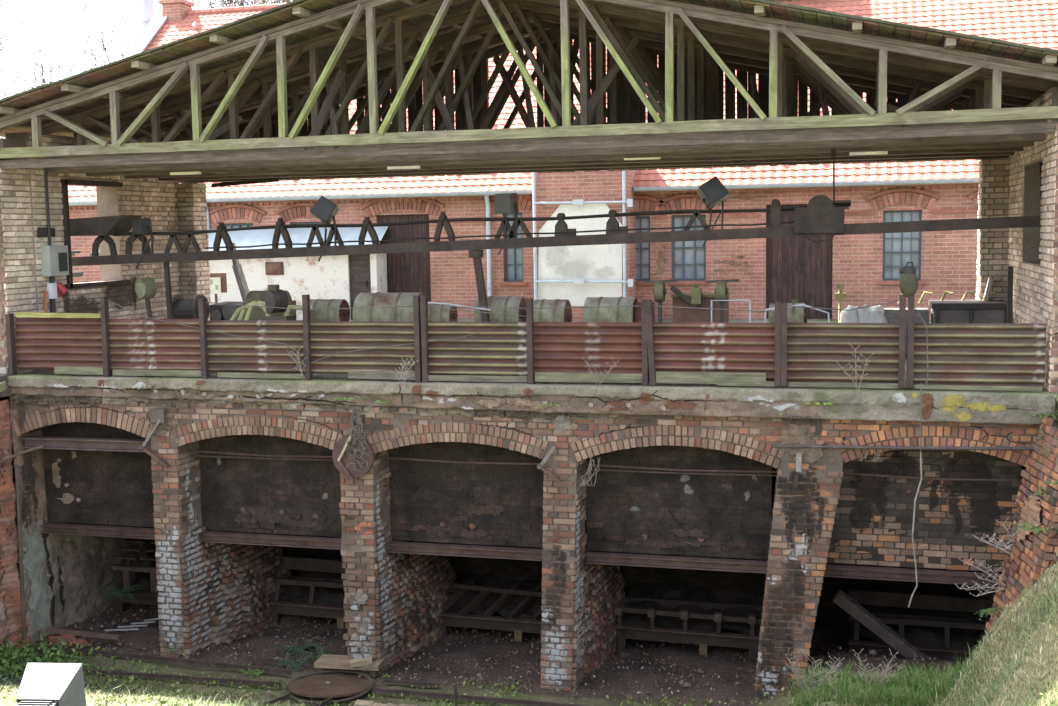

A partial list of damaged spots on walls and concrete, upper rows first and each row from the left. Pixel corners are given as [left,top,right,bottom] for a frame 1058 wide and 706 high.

water stain [155,458,254,654]
water stain [349,479,435,659]
water stain [541,496,592,688]
water stain [756,494,825,697]